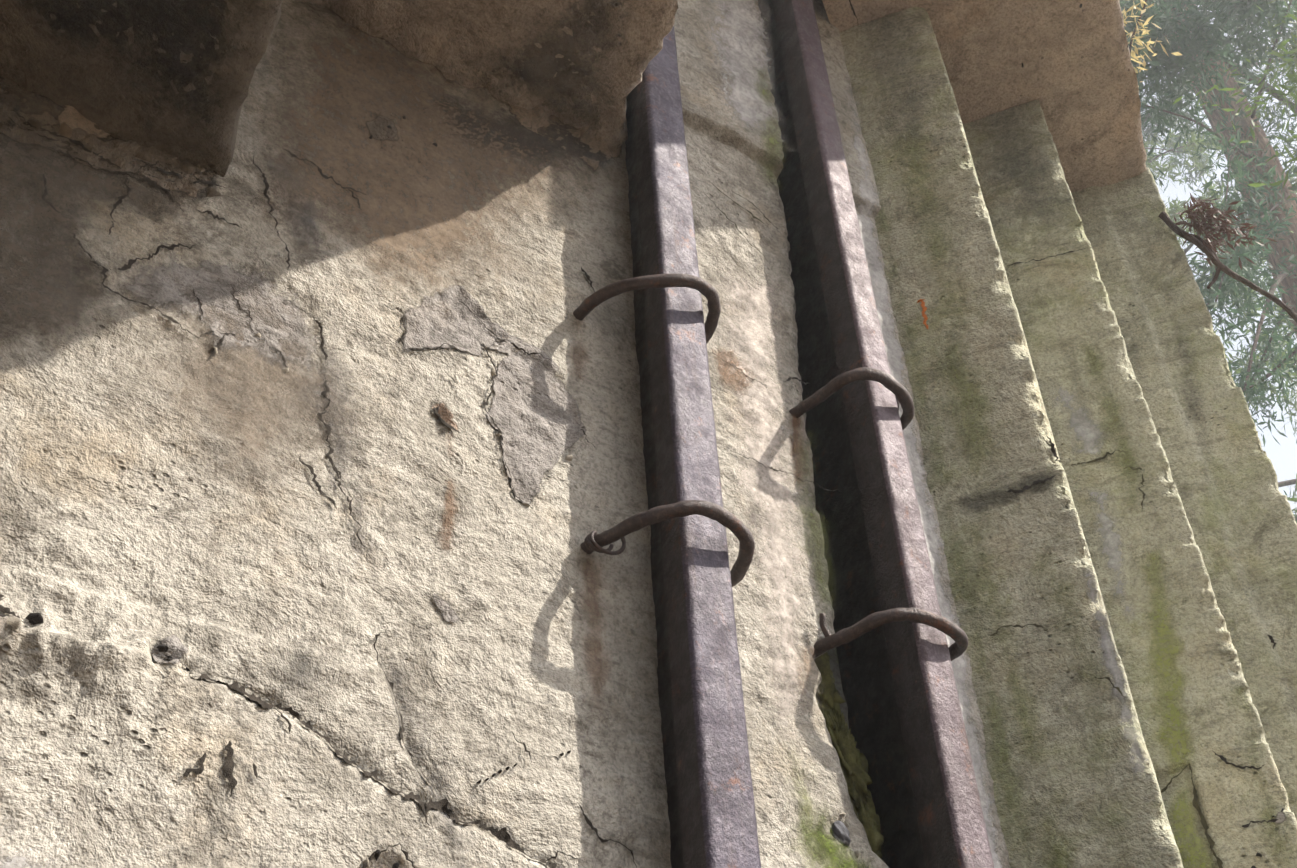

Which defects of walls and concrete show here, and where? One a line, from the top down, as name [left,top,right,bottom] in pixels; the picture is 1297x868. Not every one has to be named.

damp [28,0,227,122]
damp [0,77,213,339]
crack [42,147,288,368]
crack [253,148,368,560]
crack [384,304,407,346]
peeling [404,285,586,508]
spalling [363,843,415,868]
crack [161,628,637,868]